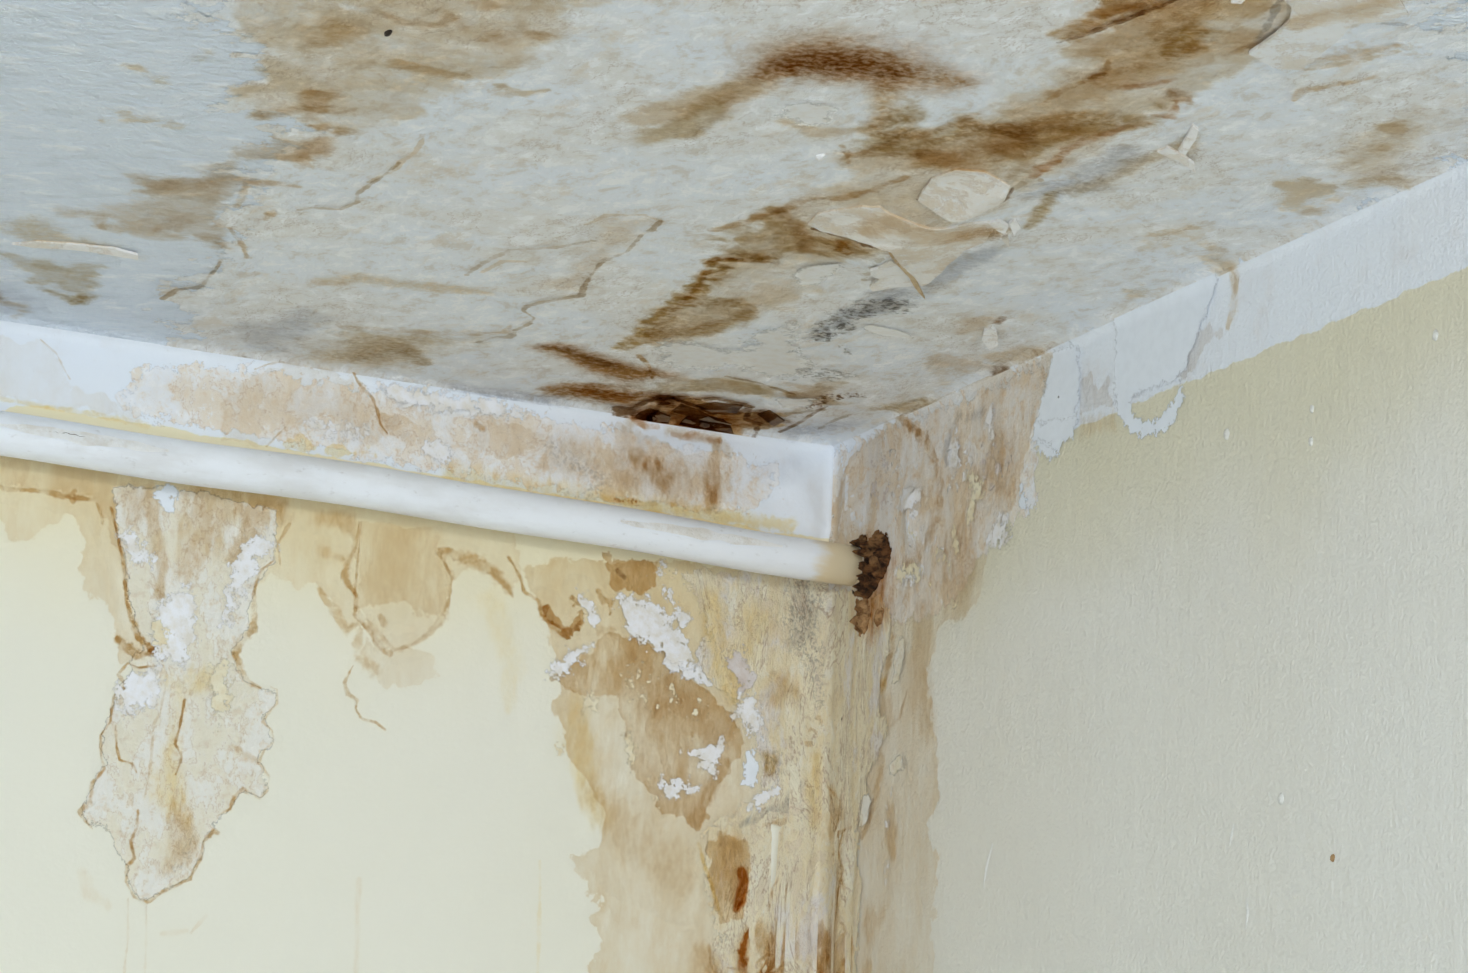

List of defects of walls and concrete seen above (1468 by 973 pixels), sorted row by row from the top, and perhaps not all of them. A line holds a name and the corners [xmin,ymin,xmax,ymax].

peeling [12,240,138,260]
peeling [114,0,1468,521]
damp [543,299,913,402]
damp [1031,341,1080,462]
damp [1112,273,1219,439]
damp [113,581,202,718]
peeling [82,484,277,900]
damp [217,527,281,629]
damp [543,559,781,819]
flaking render [668,360,1047,973]
rust [849,529,892,637]
damp [894,402,1029,609]